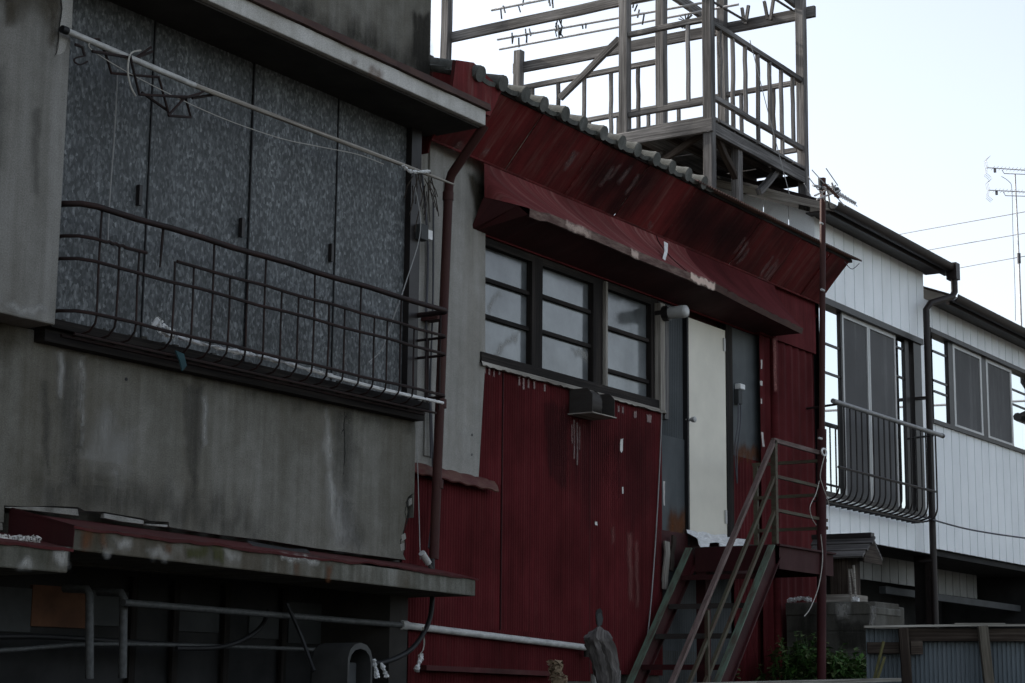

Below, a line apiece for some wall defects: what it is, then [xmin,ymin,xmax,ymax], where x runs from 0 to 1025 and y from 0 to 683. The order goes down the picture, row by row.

peeling [691,272,715,290]